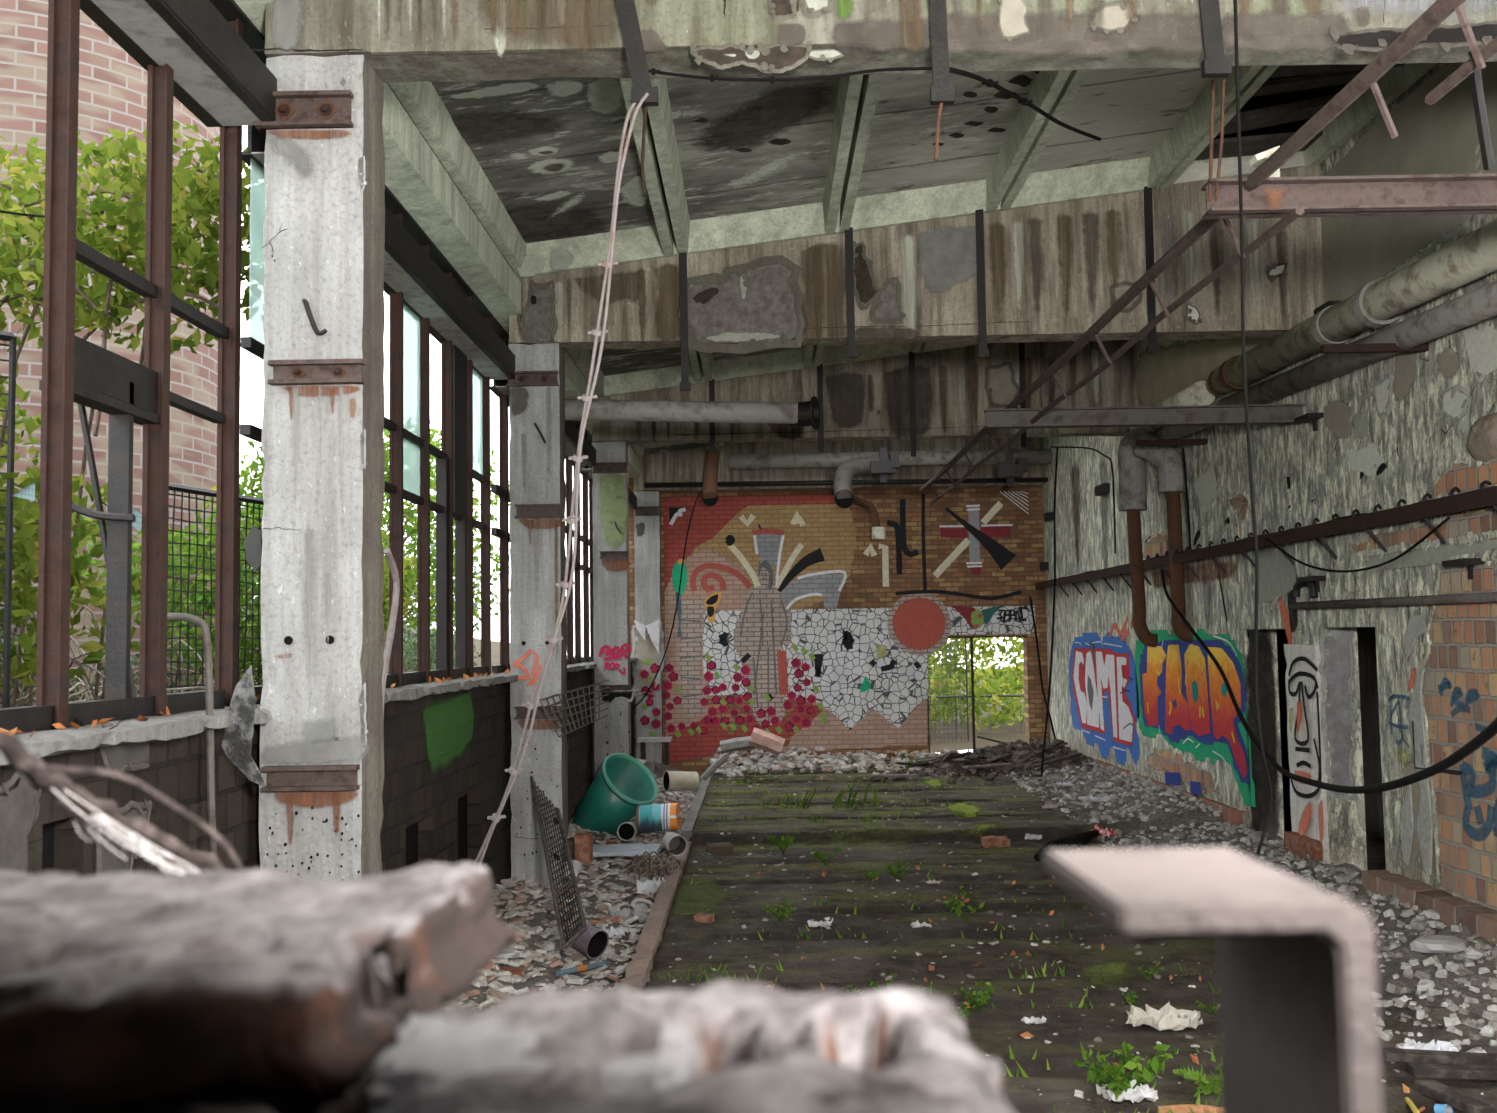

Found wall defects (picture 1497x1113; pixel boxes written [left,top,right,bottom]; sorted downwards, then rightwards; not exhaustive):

peeling [998,0,1028,43]
peeling [1090,0,1139,35]
damp [450,78,624,115]
damp [527,146,573,174]
damp [534,191,584,217]
damp [801,210,1122,341]
spalling [677,255,805,354]
peeling [1438,320,1497,426]
rust [284,386,359,419]
rust [1152,562,1237,587]
flaking render [1351,456,1497,910]
rust [276,791,357,843]